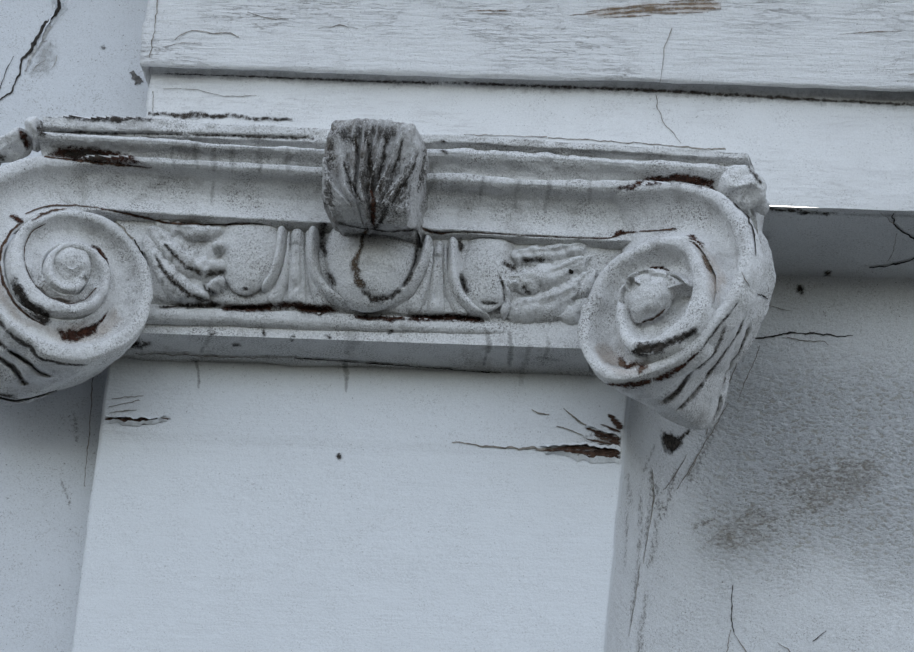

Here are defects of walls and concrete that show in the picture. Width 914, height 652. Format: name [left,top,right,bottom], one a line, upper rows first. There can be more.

crack [0,0,68,100]
crack [464,29,726,150]
rust [44,146,152,168]
crack [869,213,914,268]
rust [58,313,107,341]
peeling [105,396,169,426]
peeling [452,408,623,464]
crack [726,586,747,652]